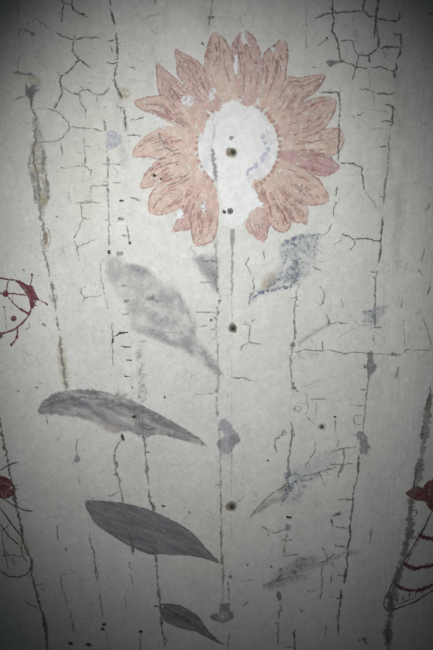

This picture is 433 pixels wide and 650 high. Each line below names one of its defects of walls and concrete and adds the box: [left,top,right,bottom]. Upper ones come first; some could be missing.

crack [18,0,144,389]
peeling [211,99,268,229]
crack [315,0,403,203]
crack [289,187,430,420]
crack [0,418,48,650]
crack [107,440,134,582]
crack [140,417,166,645]
crack [218,529,229,599]
crack [274,422,295,467]
crack [303,441,360,634]
crack [383,460,423,650]
crack [421,386,432,444]